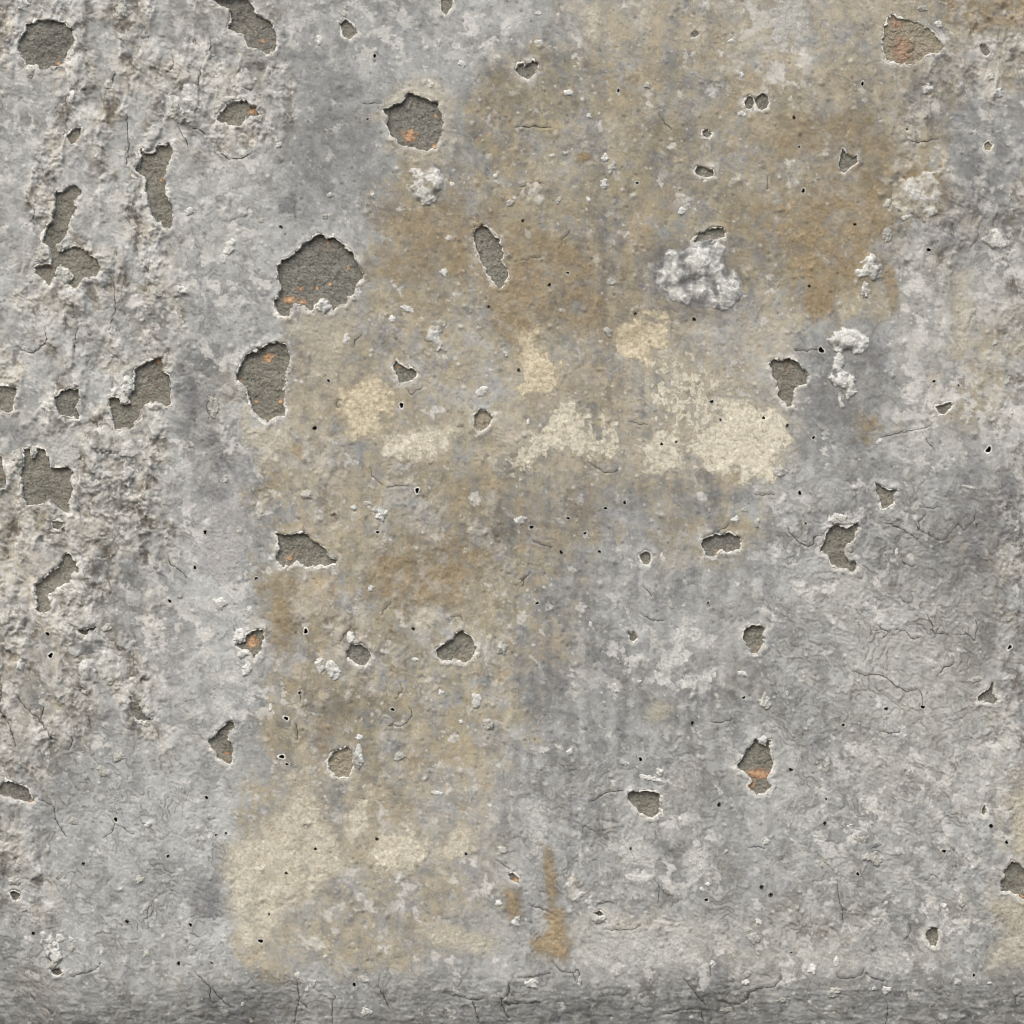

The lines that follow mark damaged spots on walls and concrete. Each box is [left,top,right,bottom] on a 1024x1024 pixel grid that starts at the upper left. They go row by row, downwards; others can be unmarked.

spalling [18,18,77,71]
spalling [881,14,943,67]
spalling [375,84,454,160]
spalling [131,141,175,233]
spalling [272,233,364,319]
spalling [470,225,509,289]
spalling [234,342,294,460]
peeling [616,309,809,484]
spalling [274,530,338,572]
spalling [818,520,862,574]
spalling [434,631,479,666]
spalling [734,739,776,796]